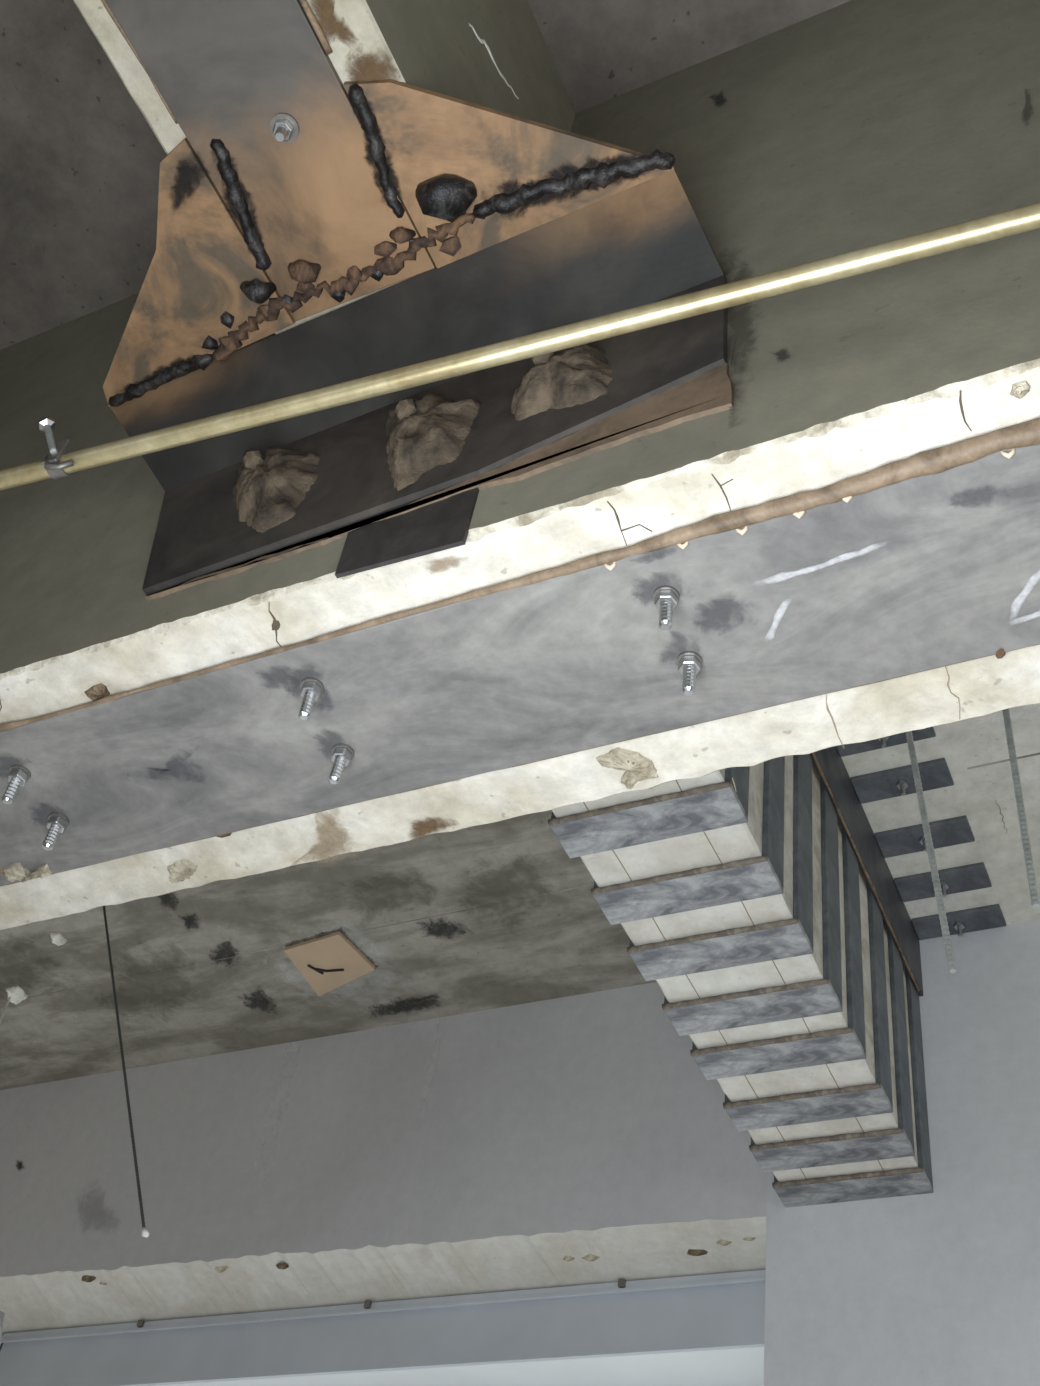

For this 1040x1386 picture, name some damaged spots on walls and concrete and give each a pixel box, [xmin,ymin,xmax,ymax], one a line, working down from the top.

spalling [596,747,659,789]